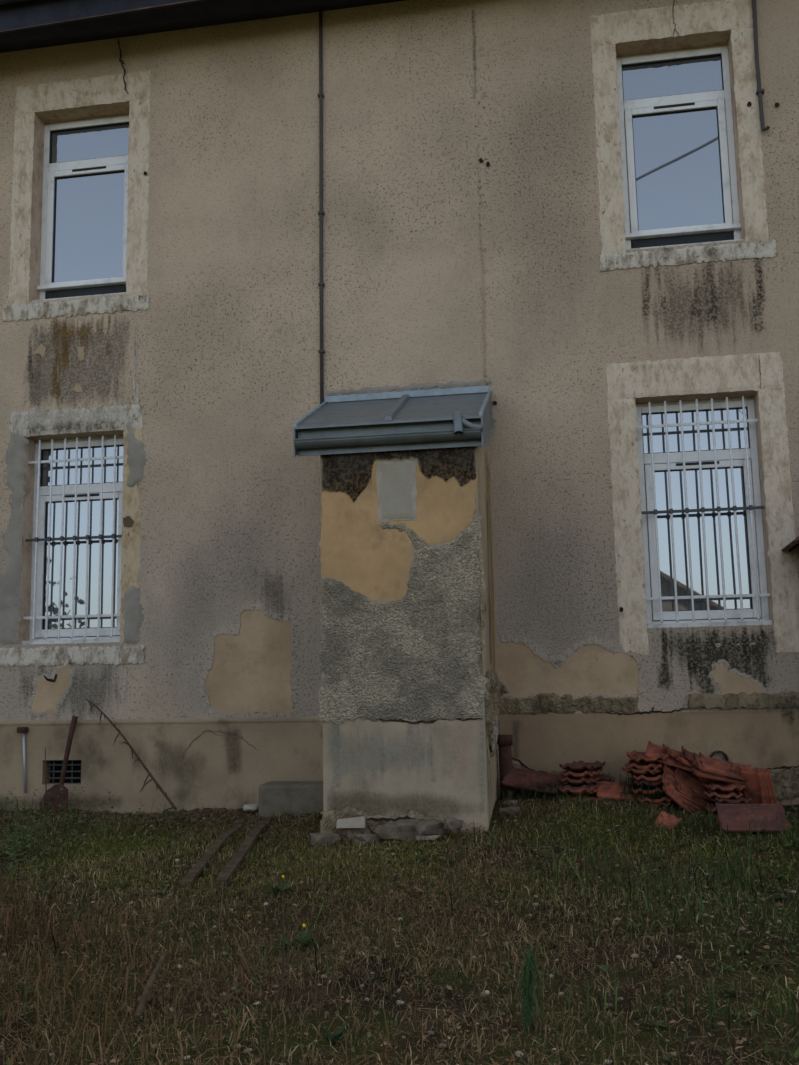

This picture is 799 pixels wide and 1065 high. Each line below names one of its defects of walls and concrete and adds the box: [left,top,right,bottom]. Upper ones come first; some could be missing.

crack [118,39,129,94]
leakage [643,247,764,343]
leakage [15,321,139,434]
peeling [318,461,478,602]
peeling [27,664,76,721]
peeling [196,600,302,719]
peeling [480,570,650,757]
leakage [658,637,670,688]
leakage [688,634,728,683]
peeling [706,643,770,695]
leakage [745,633,769,687]